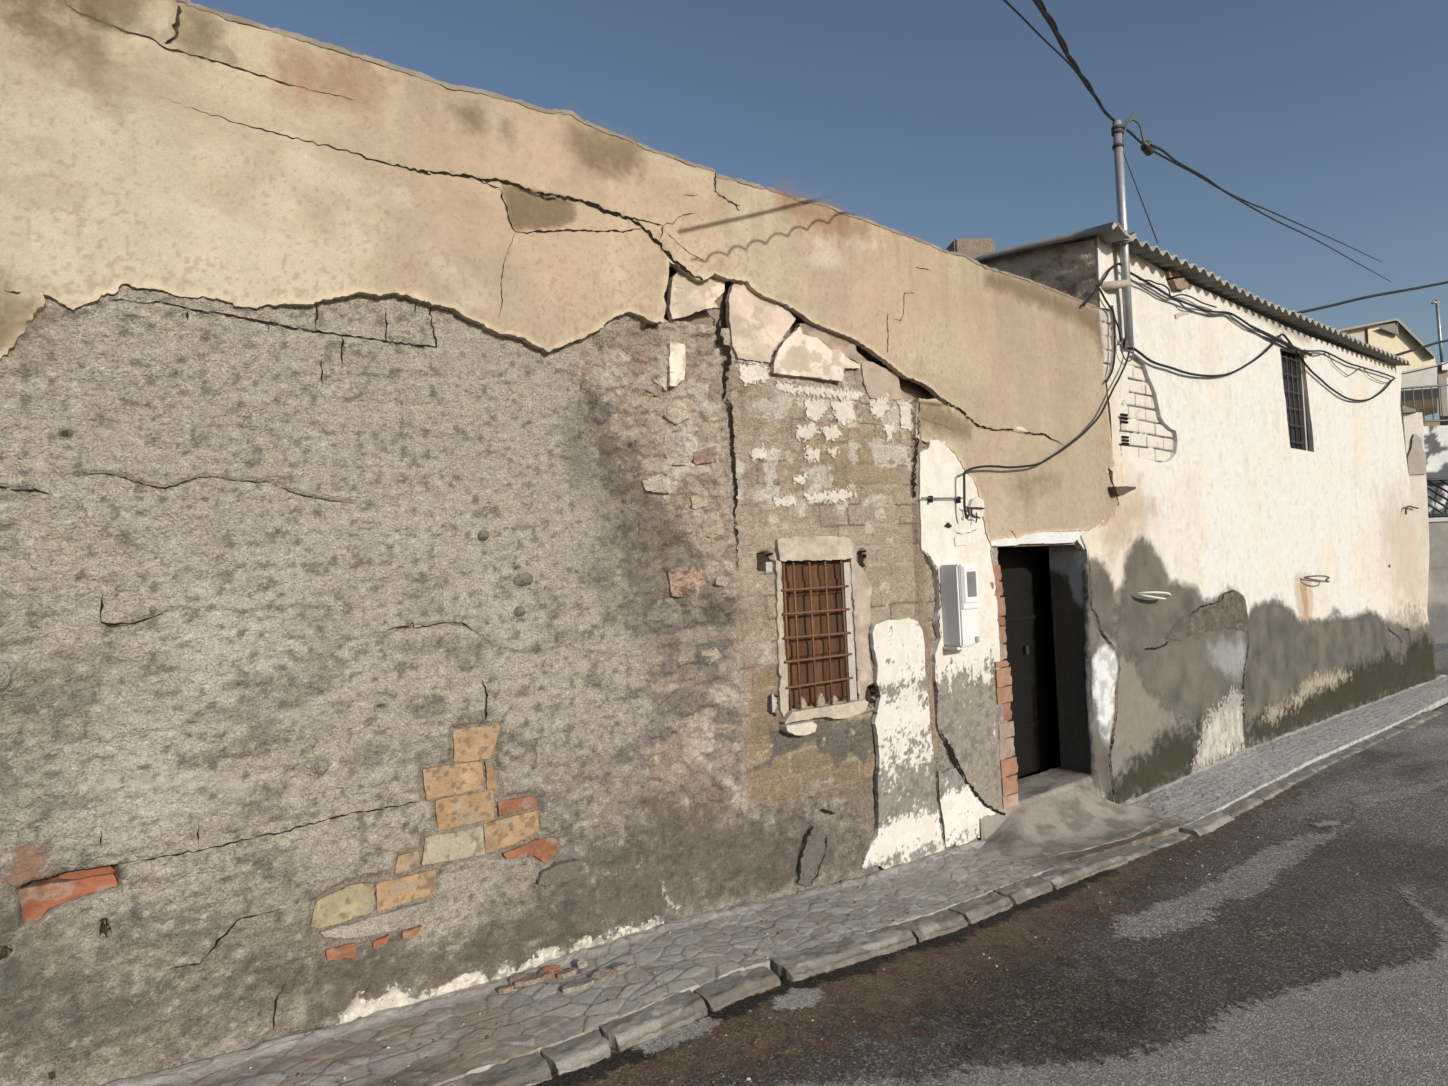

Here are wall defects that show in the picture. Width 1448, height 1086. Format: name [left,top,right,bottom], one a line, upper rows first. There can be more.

crack [65,1,353,100]
crack [112,299,437,380]
crack [171,100,796,569]
crack [887,267,929,353]
flaking render [1099,308,1173,462]
crack [0,473,347,503]
crack [100,593,162,625]
crack [382,622,472,634]
crack [481,680,489,720]
flaking render [0,282,1088,1086]
leakage [1086,537,1392,800]